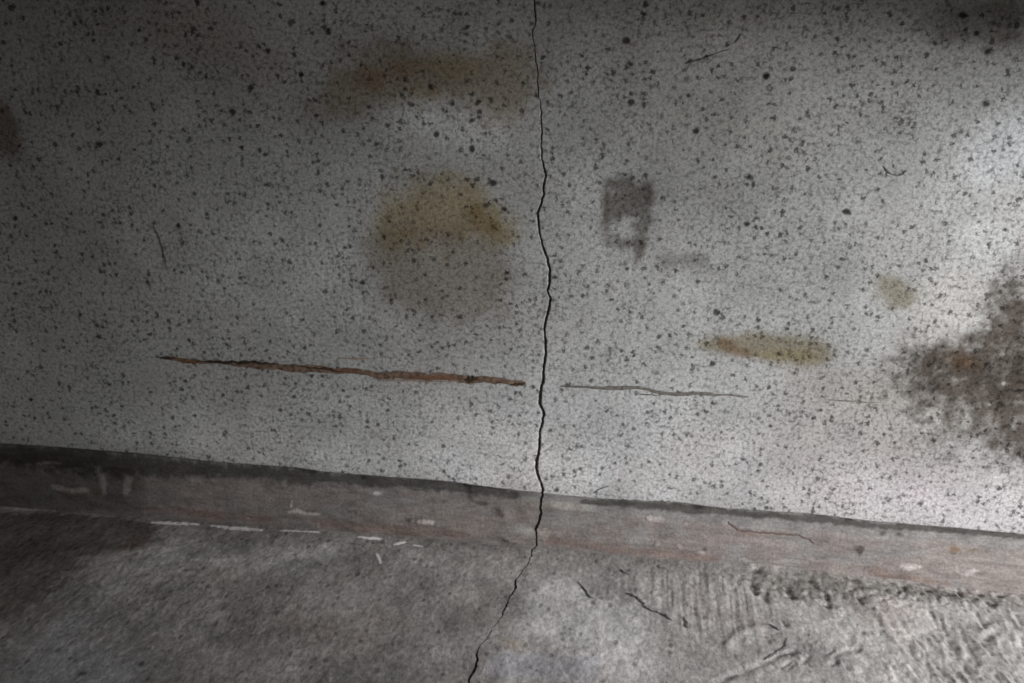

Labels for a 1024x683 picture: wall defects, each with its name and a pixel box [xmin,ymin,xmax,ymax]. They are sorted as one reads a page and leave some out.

leakage [596,170,731,289]
rust [160,356,526,387]
crack [468,0,747,683]
rust [688,327,844,374]
leakage [865,93,1024,491]
crack [765,624,802,660]